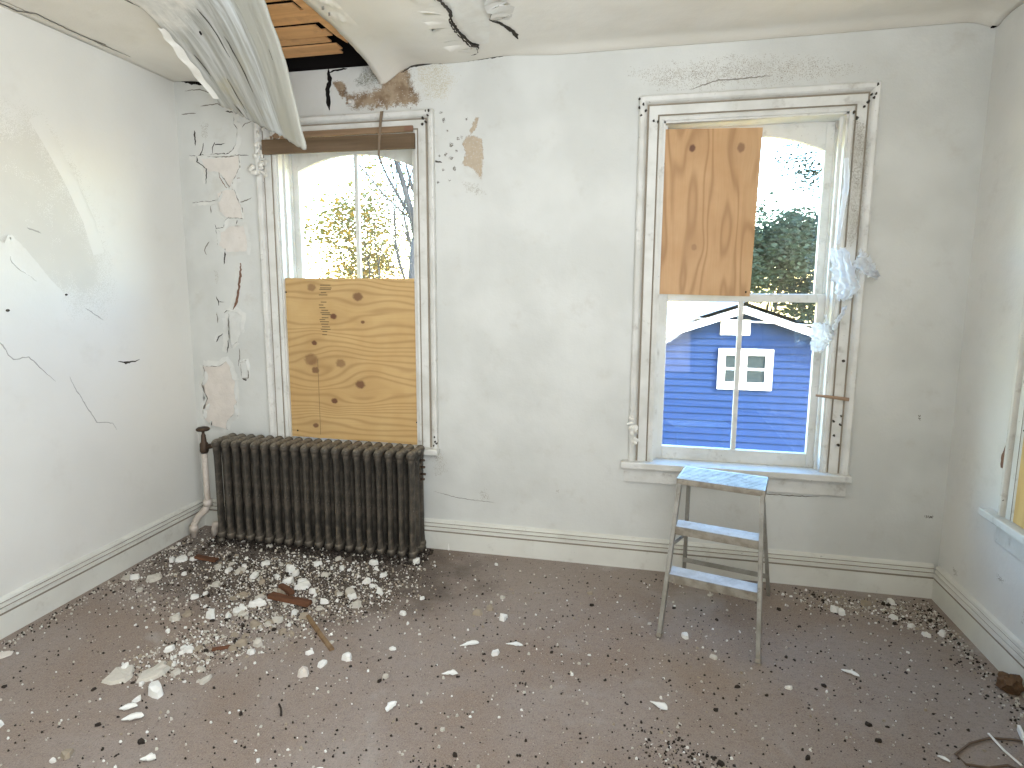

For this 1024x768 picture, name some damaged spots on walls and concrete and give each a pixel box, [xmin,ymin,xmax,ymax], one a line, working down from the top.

peeling [450,0,519,44]
peeling [158,28,219,99]
peeling [0,235,65,312]
crack [0,343,116,428]
peeling [199,307,251,434]